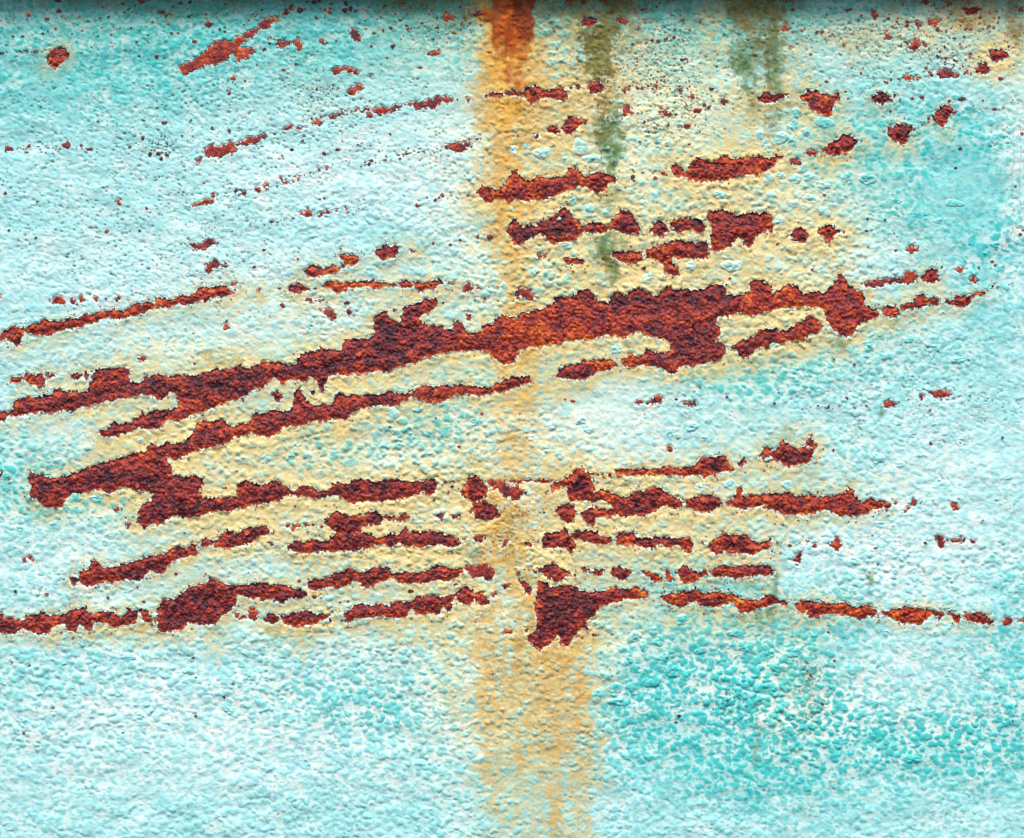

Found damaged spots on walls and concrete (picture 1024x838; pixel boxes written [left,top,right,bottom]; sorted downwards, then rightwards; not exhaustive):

damp [584,0,632,82]
damp [596,94,616,155]
rust [285,236,480,334]
damp [594,233,622,280]
rust [7,261,979,837]